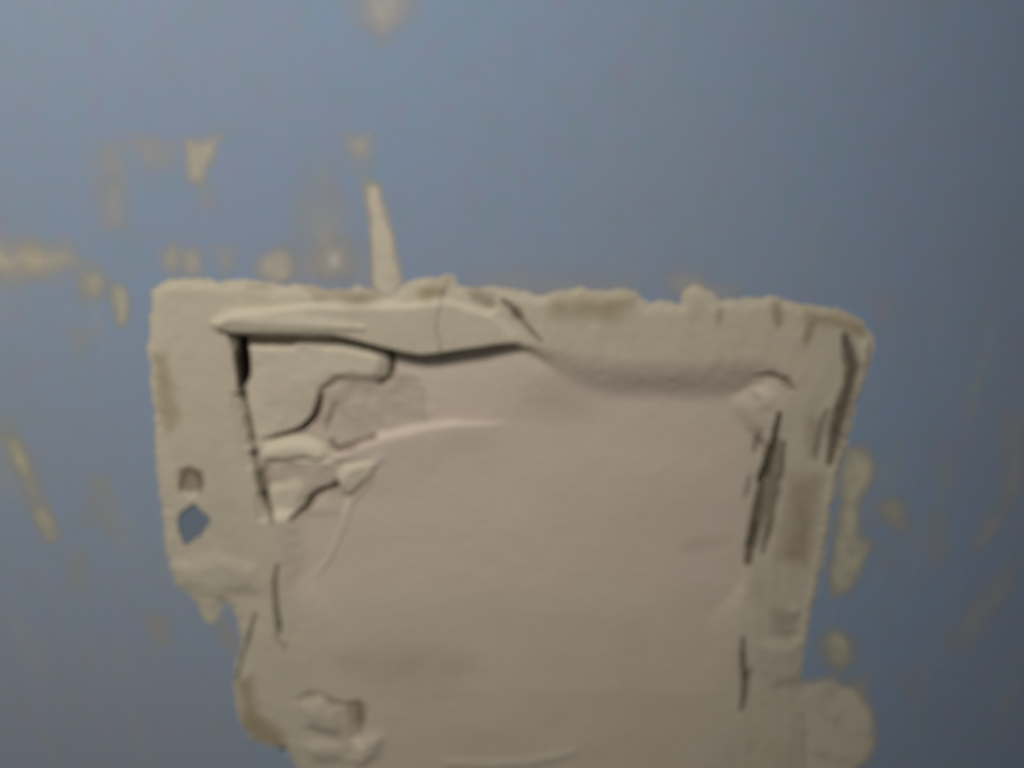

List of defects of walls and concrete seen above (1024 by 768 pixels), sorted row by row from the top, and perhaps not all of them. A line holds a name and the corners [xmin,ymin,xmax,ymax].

flaking render [179,504,211,544]
crack [221,331,340,519]
flaking render [247,334,430,521]
crack [378,349,395,384]
crack [744,412,785,564]
crack [827,335,856,465]